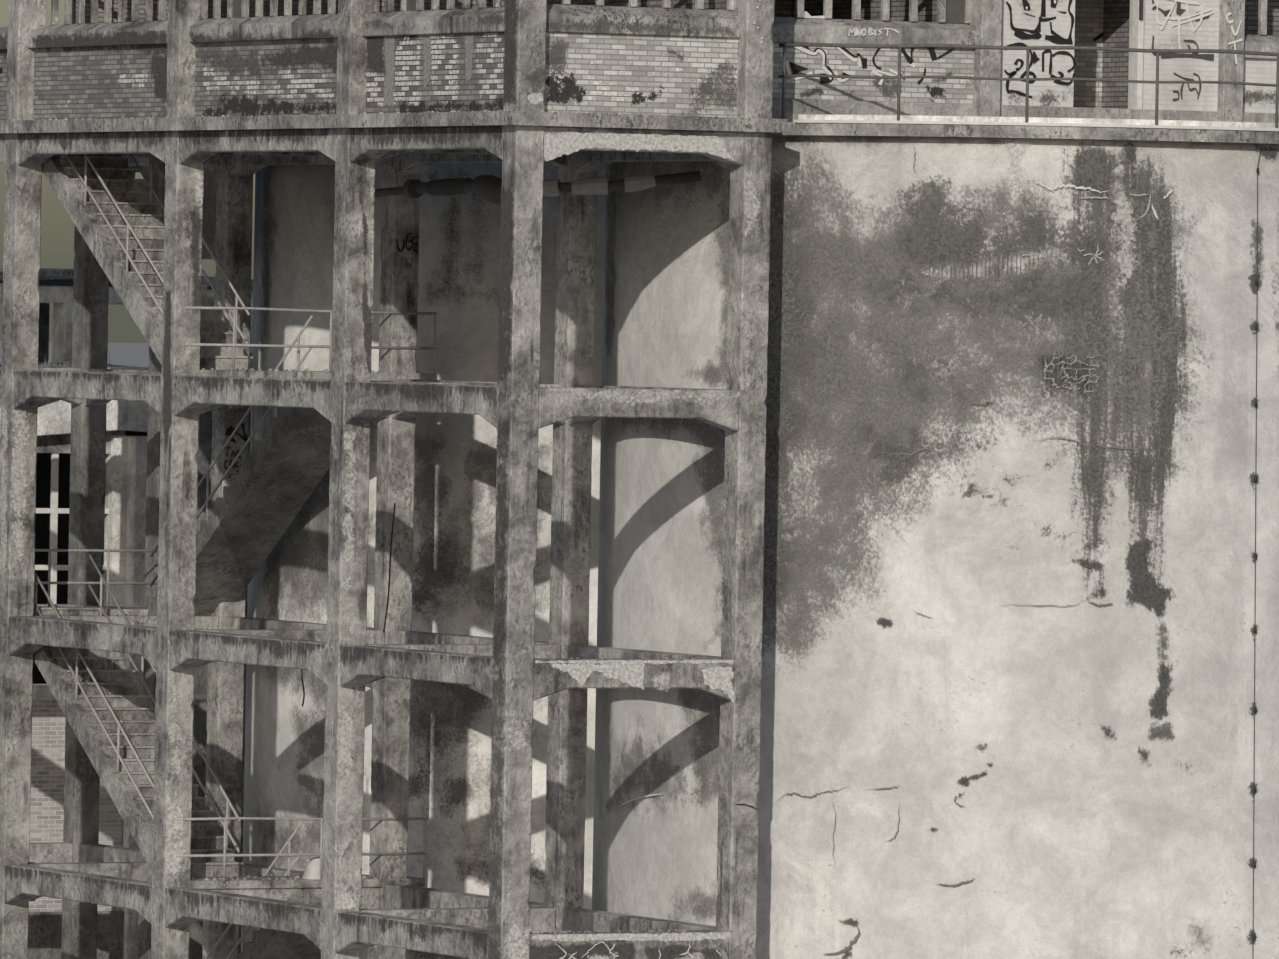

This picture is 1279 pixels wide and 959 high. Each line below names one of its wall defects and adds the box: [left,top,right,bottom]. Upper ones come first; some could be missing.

leakage [0,290,330,450]
leakage [189,165,204,306]
leakage [265,431,372,616]
leakage [346,168,514,406]
leakage [606,162,669,355]
leakage [549,210,753,566]
leakage [744,140,1204,762]
leakage [165,631,355,921]
leakage [335,420,510,959]
peeling [535,660,734,702]
leakage [607,688,720,809]
leakage [4,865,149,904]